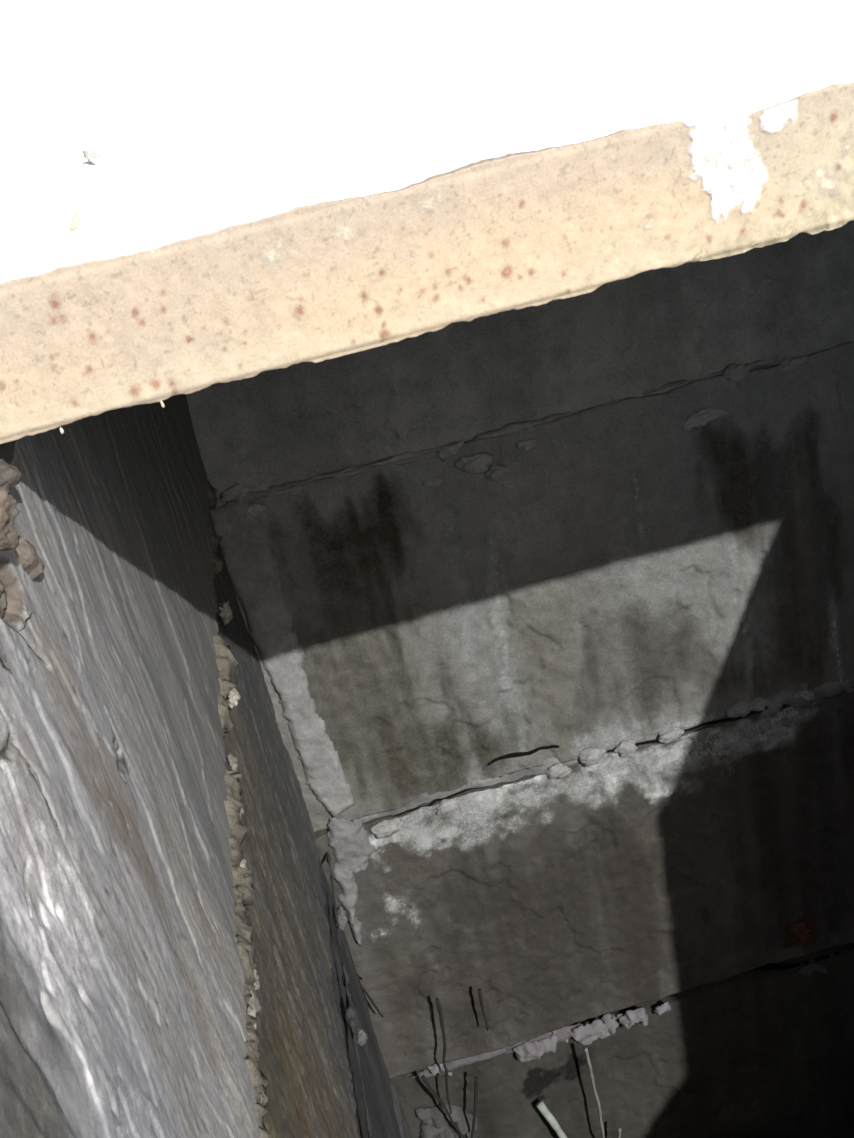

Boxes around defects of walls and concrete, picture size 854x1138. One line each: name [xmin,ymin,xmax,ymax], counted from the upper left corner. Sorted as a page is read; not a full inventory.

spalling [0,535,45,628]
damp [305,475,404,661]
damp [702,425,820,674]
crack [392,745,559,817]
damp [368,613,809,857]
crack [607,739,659,752]
crack [684,692,852,732]
crack [752,945,854,971]